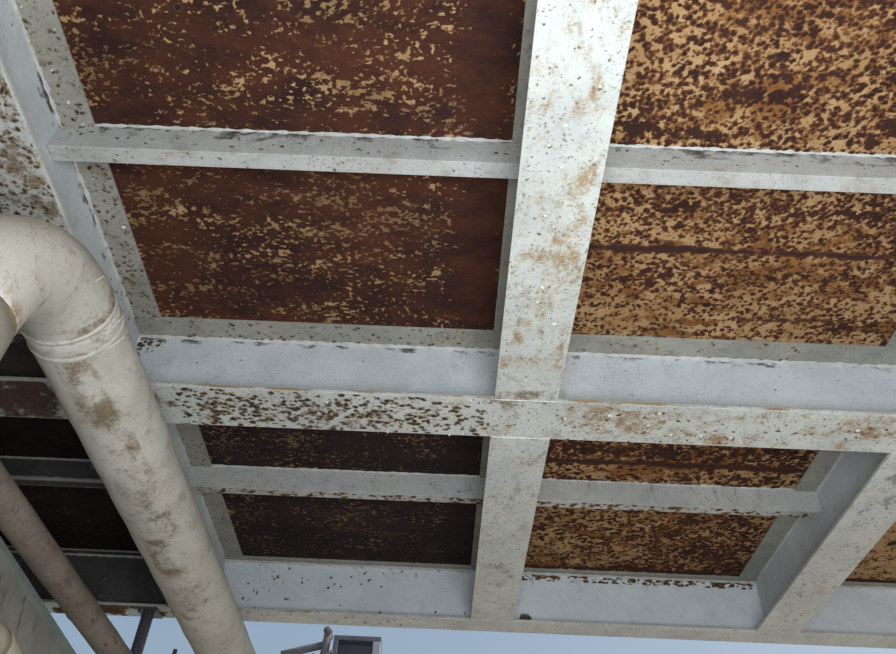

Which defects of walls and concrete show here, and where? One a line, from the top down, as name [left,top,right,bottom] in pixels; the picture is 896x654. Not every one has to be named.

corrosion [608,0,896,161]
corrosion [0,78,64,227]
corrosion [38,0,550,348]
corrosion [517,160,896,361]
corrosion [154,374,546,476]
corrosion [539,395,896,492]
corrosion [197,487,523,588]
corrosion [506,495,814,590]
corrosion [844,508,896,583]